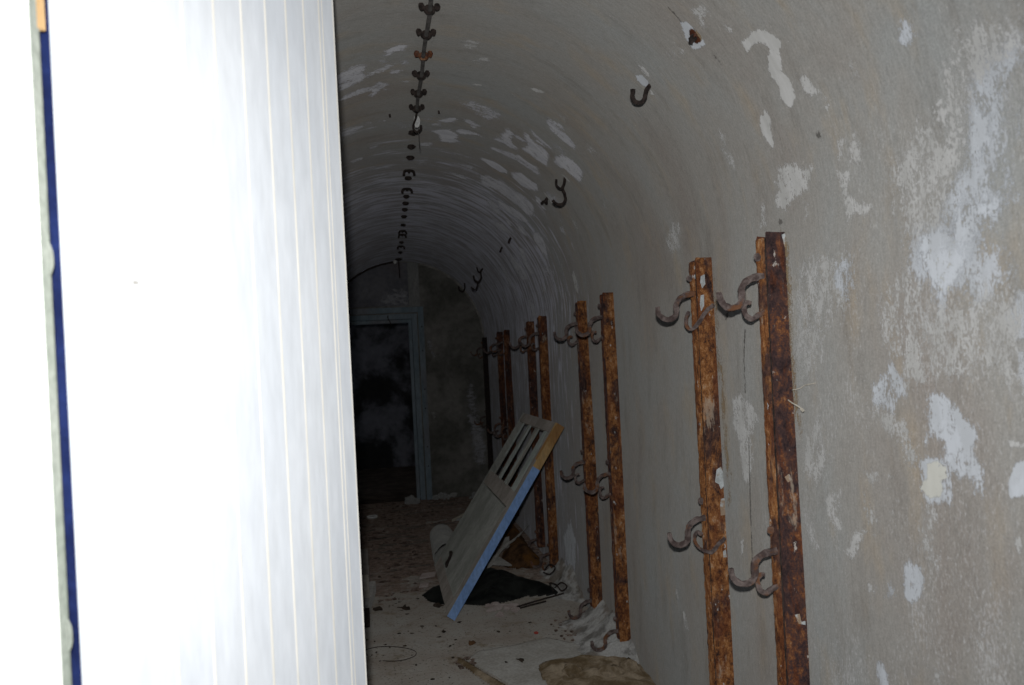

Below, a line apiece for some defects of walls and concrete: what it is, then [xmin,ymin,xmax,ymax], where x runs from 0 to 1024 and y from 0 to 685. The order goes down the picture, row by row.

peeling [721,23,830,111]
peeling [759,162,813,229]
peeling [1008,439,1024,499]